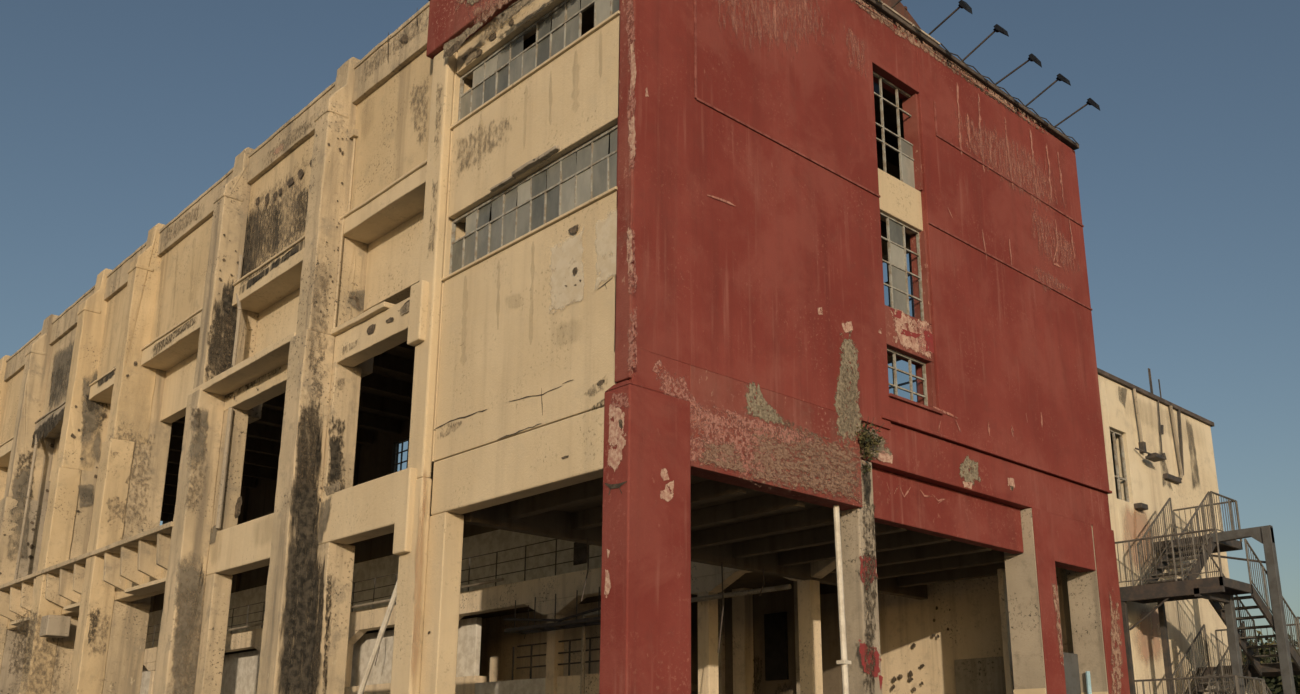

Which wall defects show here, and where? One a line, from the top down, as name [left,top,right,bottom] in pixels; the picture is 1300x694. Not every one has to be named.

peeling [443,0,534,64]
peeling [626,0,649,177]
leakage [151,178,308,381]
peeling [626,227,638,371]
peeling [878,307,934,359]
leakage [277,266,345,694]
crack [434,380,572,439]
peeling [588,380,629,472]
peeling [652,321,893,505]
spalling [959,455,981,489]
leakage [172,559,204,694]